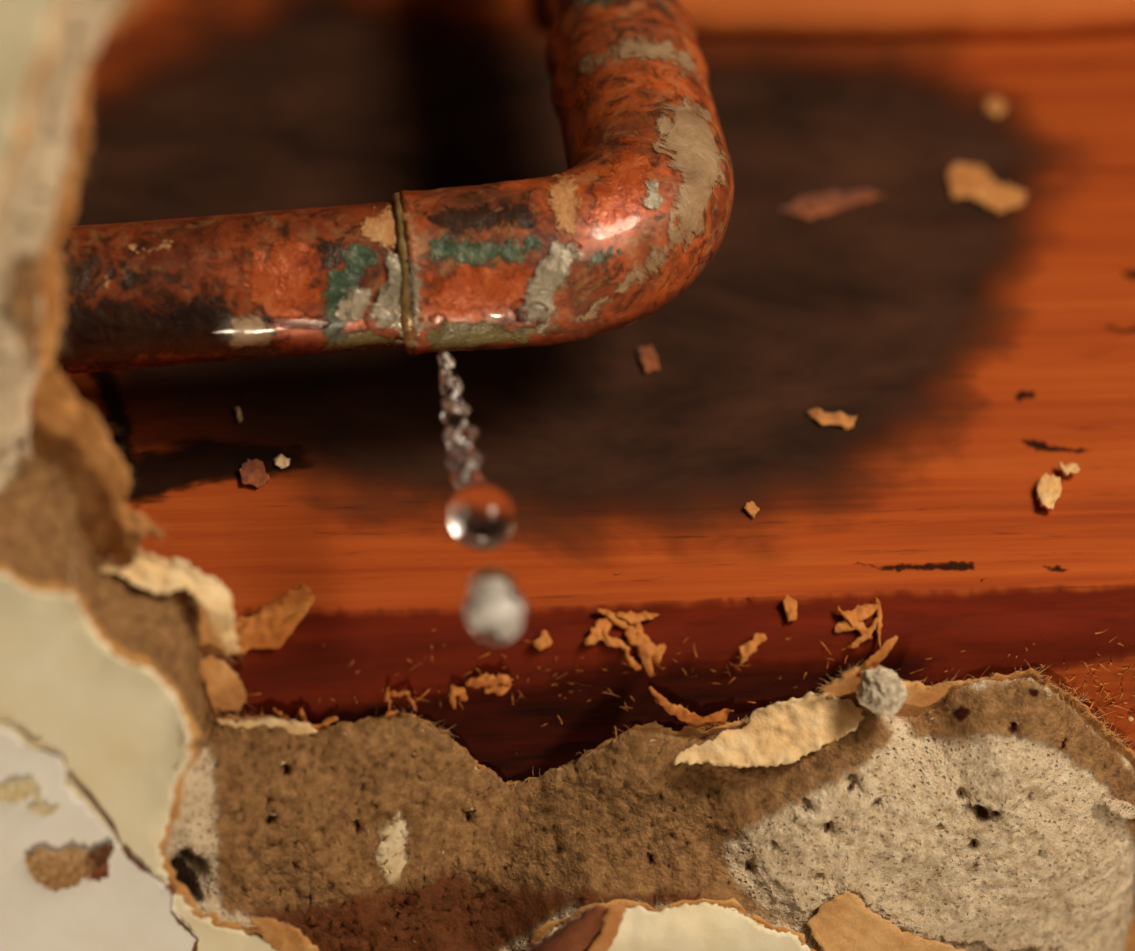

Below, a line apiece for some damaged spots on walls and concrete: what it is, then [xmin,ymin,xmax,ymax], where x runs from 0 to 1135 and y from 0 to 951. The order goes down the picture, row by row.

damp [128,240,173,254]
damp [90,371,309,502]
spalling [953,706,971,721]
spalling [960,791,1000,819]
peeling [1101,796,1135,819]
crack [0,721,199,951]
spalling [24,842,114,893]
peeling [608,902,811,951]